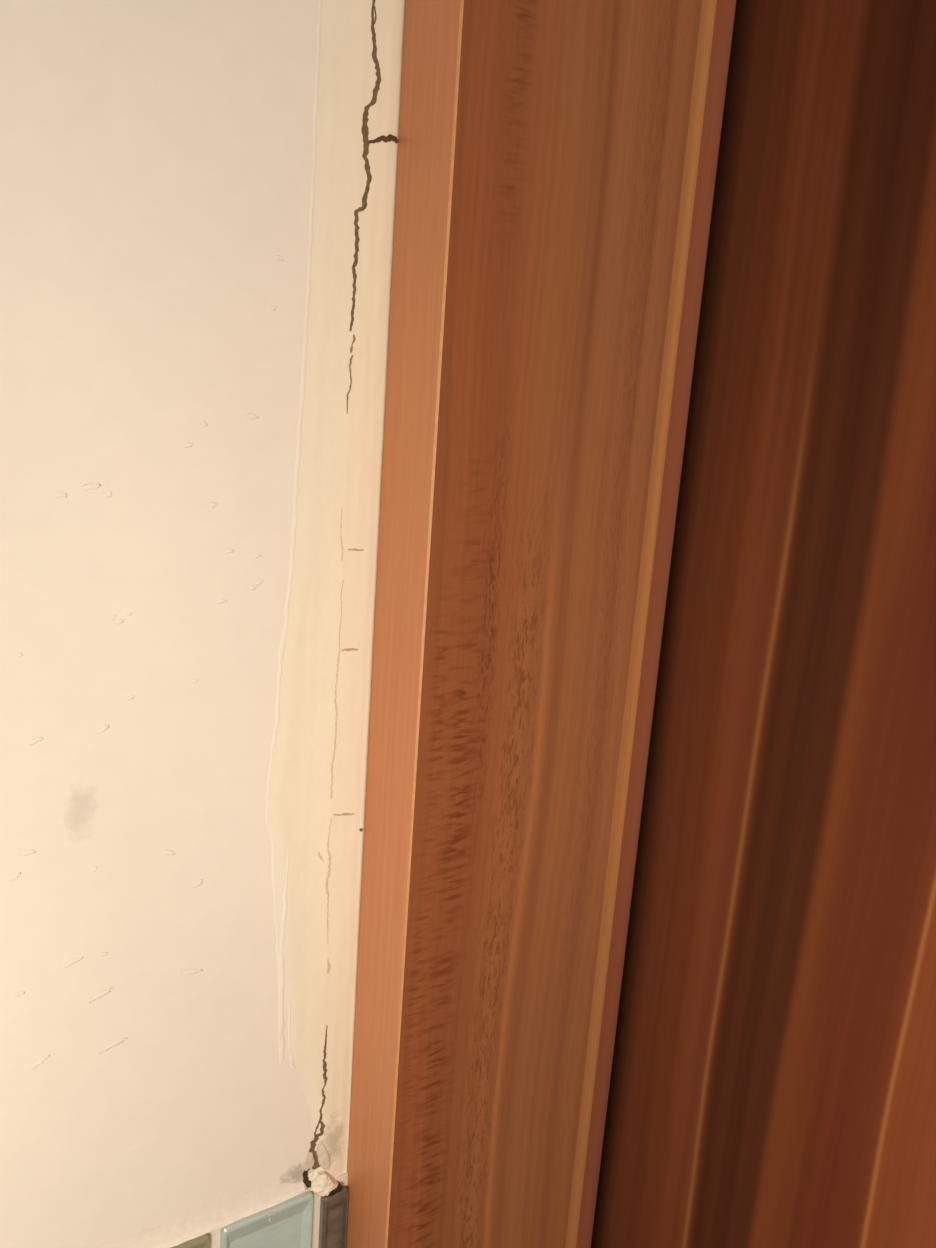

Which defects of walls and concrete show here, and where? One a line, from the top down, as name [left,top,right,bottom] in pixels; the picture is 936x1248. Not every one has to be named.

crack [346,0,399,414]
crack [318,510,364,973]
crack [309,1025,328,1170]
spalling [302,1141,343,1197]